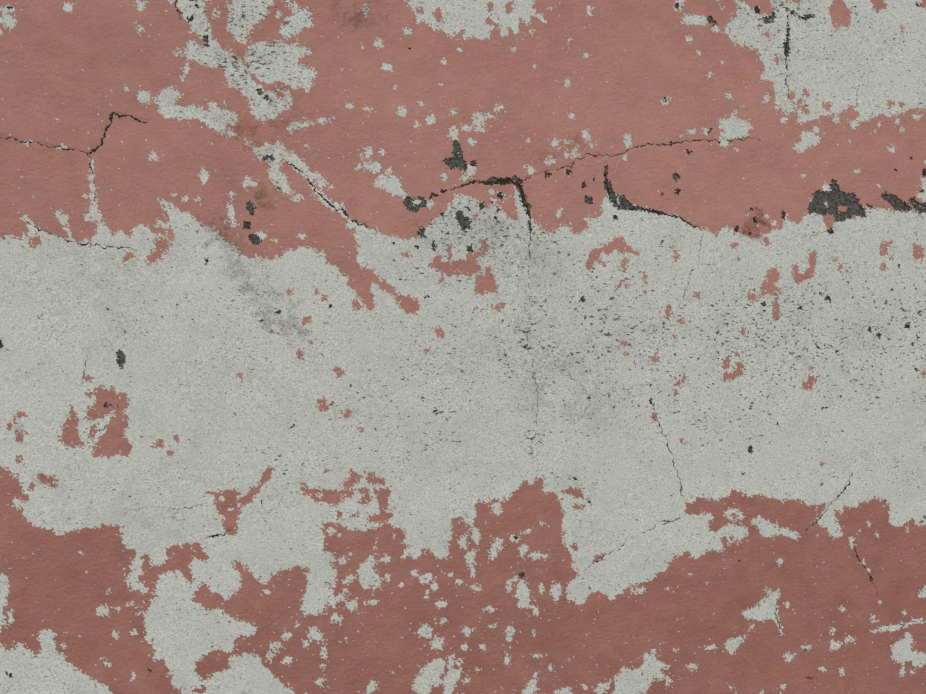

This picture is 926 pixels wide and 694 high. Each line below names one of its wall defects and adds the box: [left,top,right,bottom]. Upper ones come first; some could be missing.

spalling [133,0,160,51]
peeling [397,0,560,54]
crack [784,11,815,100]
peeling [673,0,926,158]
crack [0,112,150,201]
spalling [197,166,216,185]
spalling [242,175,261,197]
crack [282,158,368,227]
crack [24,219,130,249]
crack [569,373,684,533]
crack [802,472,853,536]
spalling [301,626,336,692]